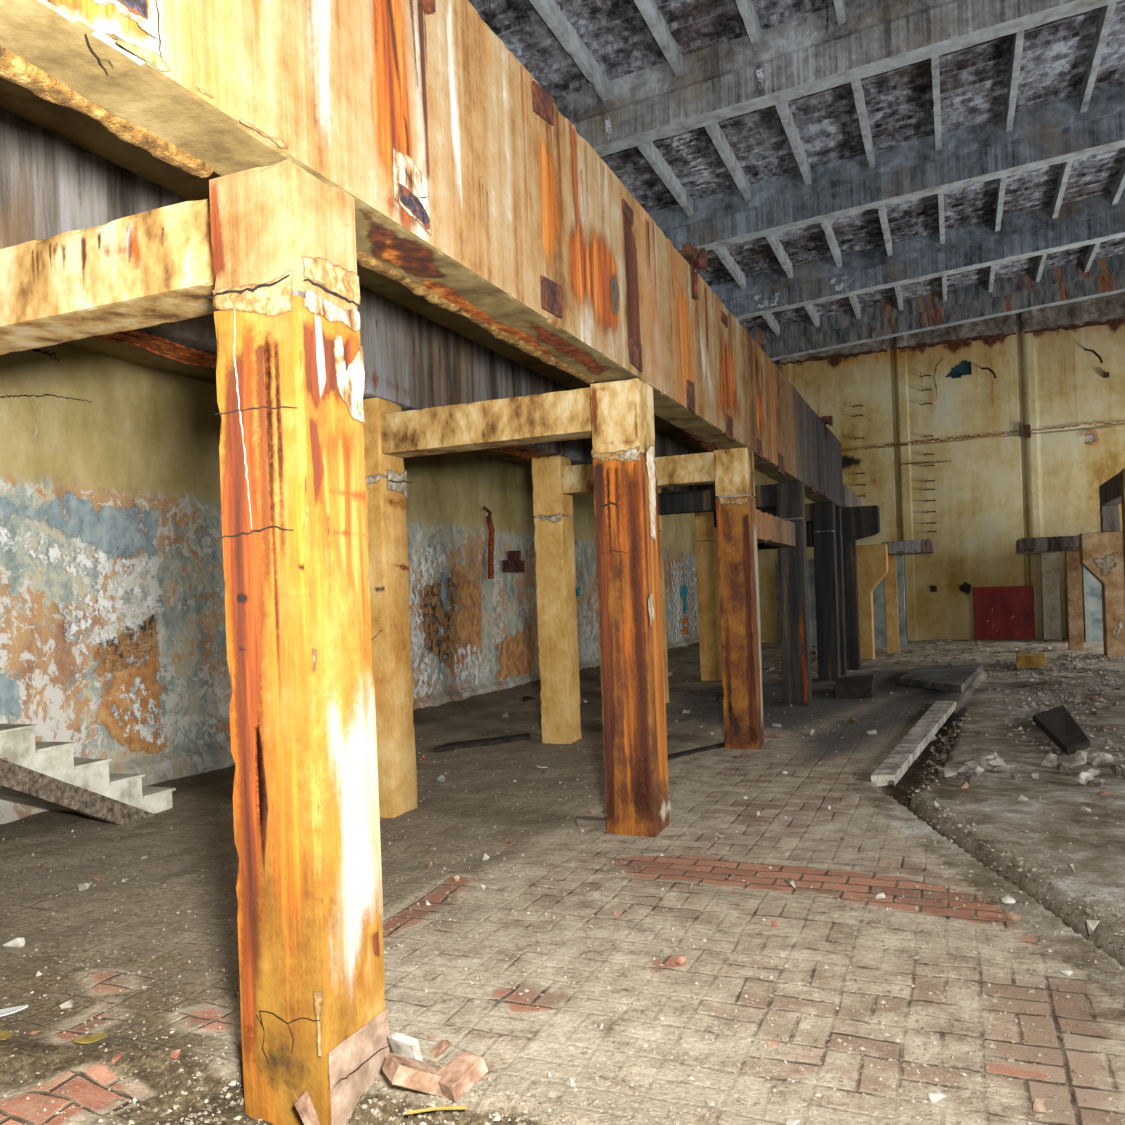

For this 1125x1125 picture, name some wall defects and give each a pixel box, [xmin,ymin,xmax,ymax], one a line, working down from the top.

spalling [93,0,171,72]
corrosion [371,0,430,176]
spalling [393,148,432,236]
corrosion [525,116,657,351]
spalling [92,330,217,369]
corrosion [304,317,359,407]
spalling [207,249,595,424]
peeling [0,492,168,754]
corrosion [222,309,287,1052]
corrosion [310,420,369,658]
peeling [408,546,535,698]
corrosion [594,463,668,819]